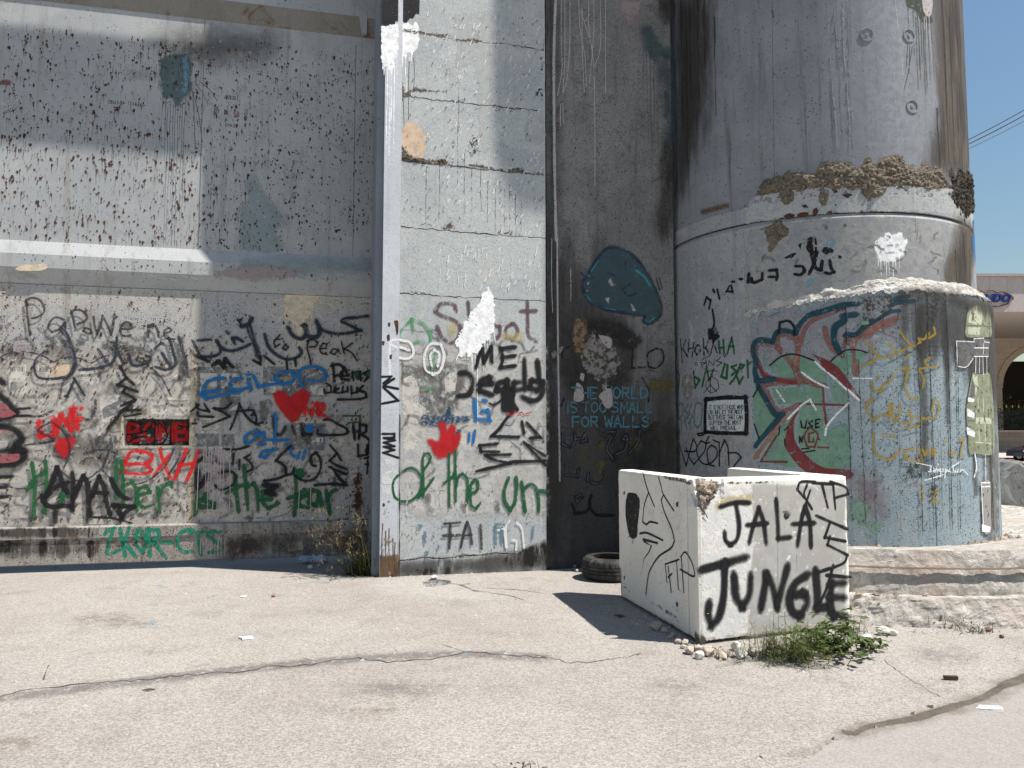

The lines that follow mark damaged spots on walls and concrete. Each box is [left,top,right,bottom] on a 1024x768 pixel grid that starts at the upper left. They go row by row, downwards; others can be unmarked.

corrosion [0,26,374,253]
damp [659,0,716,236]
spalling [757,155,975,222]
spalling [760,219,789,253]
spalling [860,294,897,322]
spalling [663,476,777,521]
spalling [904,463,938,495]